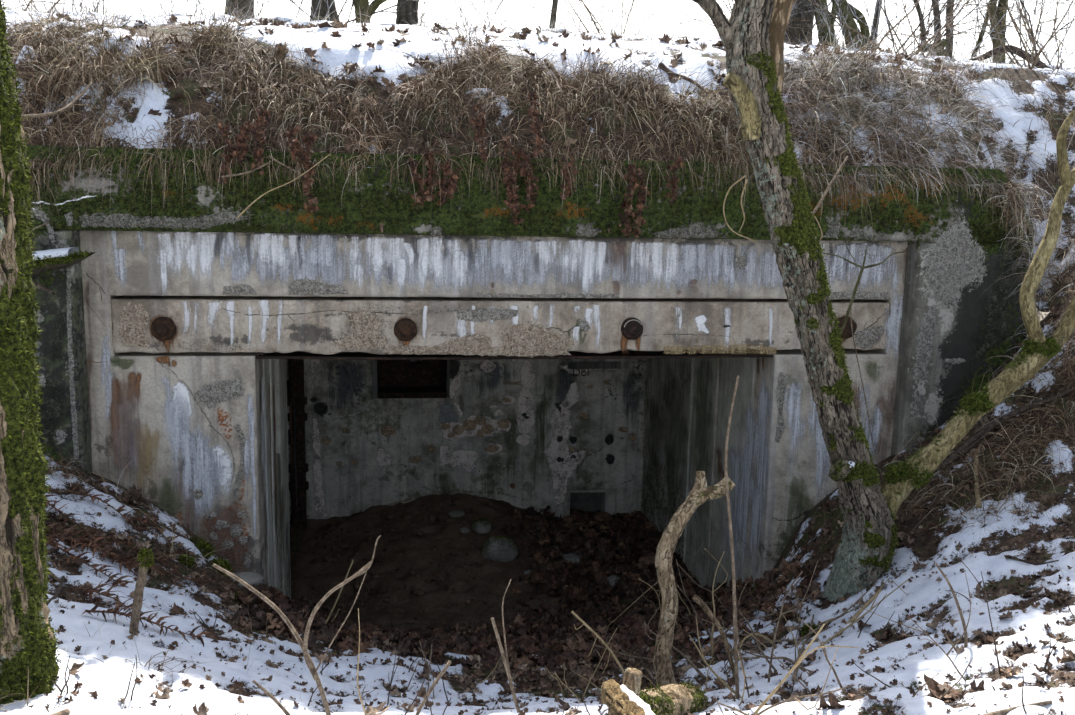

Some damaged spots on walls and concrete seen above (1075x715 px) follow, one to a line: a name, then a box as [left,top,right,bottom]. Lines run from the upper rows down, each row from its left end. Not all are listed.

damp [111,231,126,282]
damp [158,232,783,290]
damp [38,382,70,446]
damp [101,336,113,417]
rust [109,373,141,473]
rust [150,315,177,367]
damp [119,377,233,531]
damp [244,379,298,587]
peeling [605,427,636,465]
spalling [910,216,987,420]